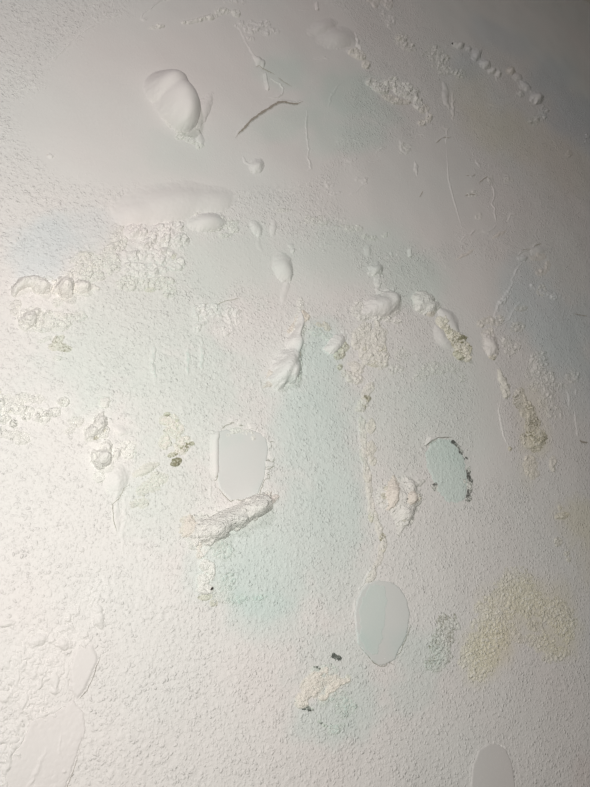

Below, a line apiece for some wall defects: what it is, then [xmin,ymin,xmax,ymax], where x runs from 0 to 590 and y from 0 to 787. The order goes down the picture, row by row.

peeling [423,436,473,503]